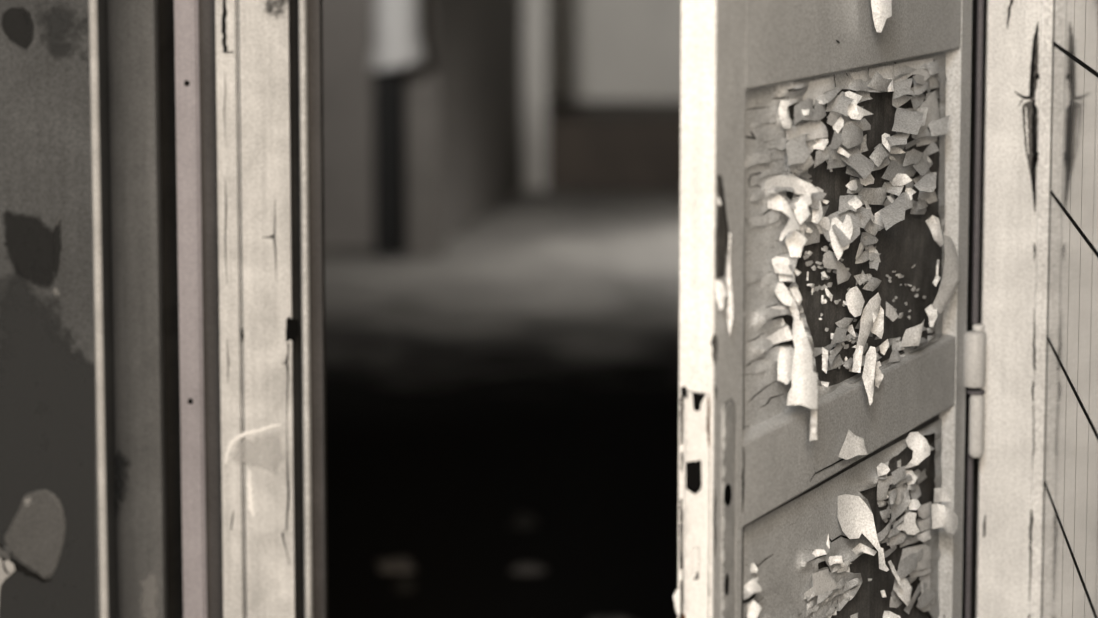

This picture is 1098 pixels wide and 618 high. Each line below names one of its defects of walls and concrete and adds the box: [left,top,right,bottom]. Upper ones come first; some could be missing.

peeling [4,211,61,295]
peeling [711,51,960,441]
flaking render [0,545,15,588]
peeling [742,418,958,618]